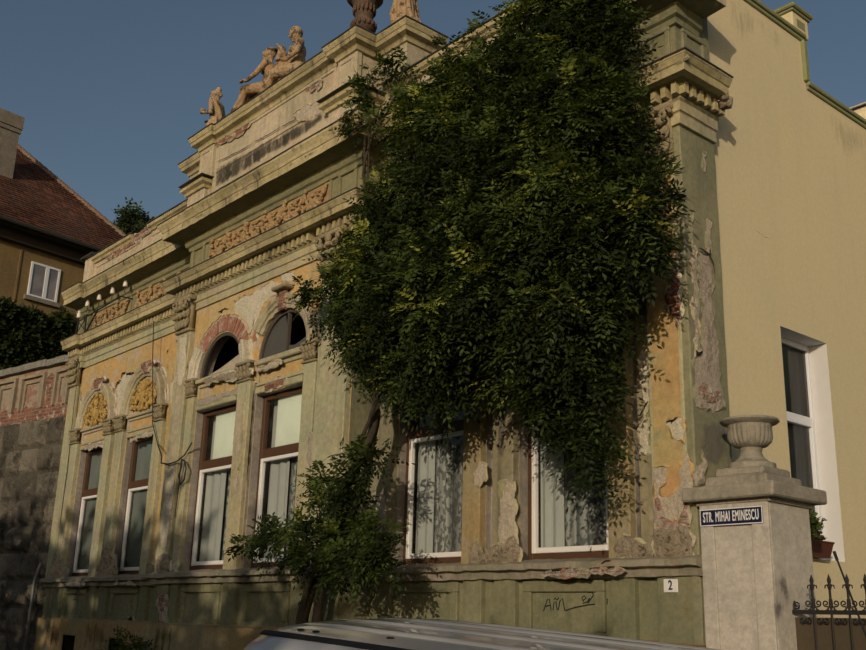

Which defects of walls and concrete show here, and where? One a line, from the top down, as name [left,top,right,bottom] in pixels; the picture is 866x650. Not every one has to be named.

flaking render [196,270,296,498]
flaking render [636,345,651,456]
flaking render [665,212,726,414]
flaking render [145,466,180,573]
spalling [468,461,523,564]
flaking render [541,417,708,580]